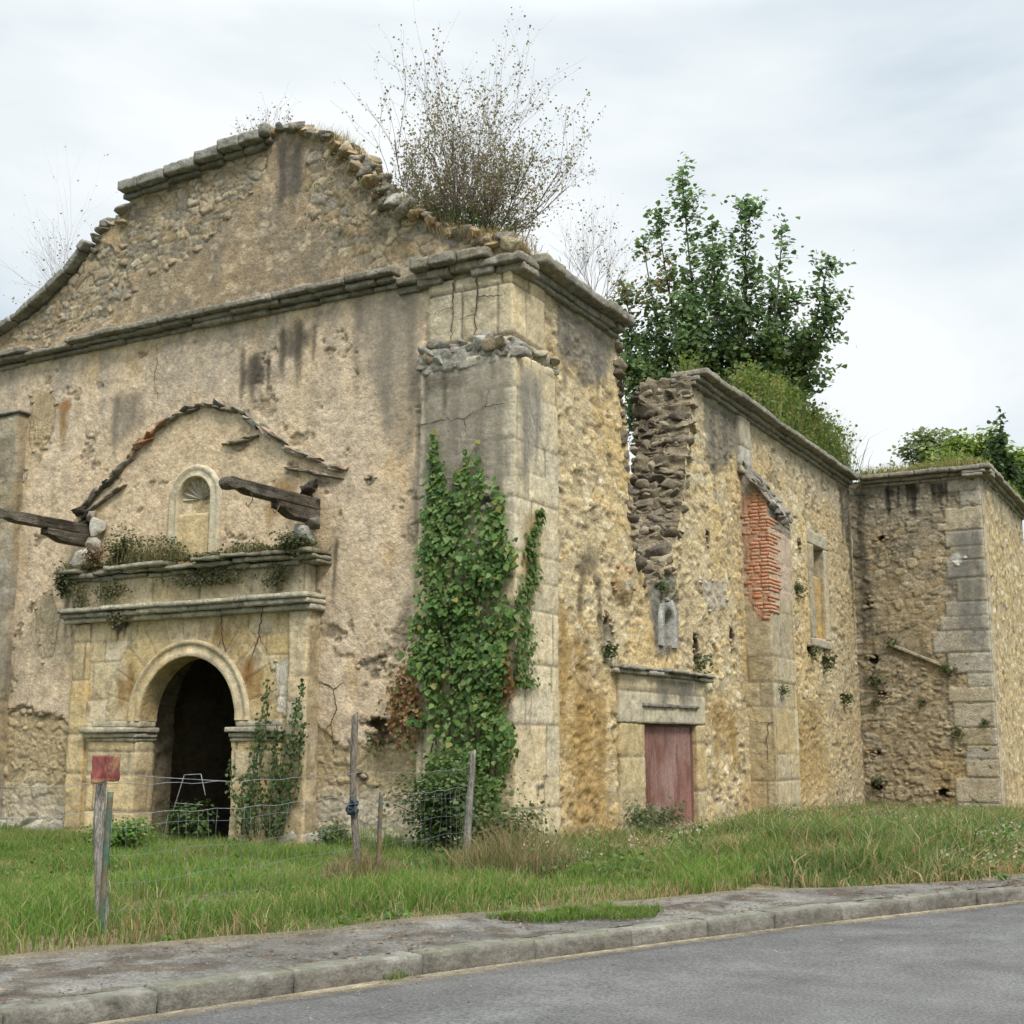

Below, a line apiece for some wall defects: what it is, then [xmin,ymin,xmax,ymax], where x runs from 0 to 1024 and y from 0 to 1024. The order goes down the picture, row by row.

crack [434,278,503,339]
leakage [241,329,315,388]
crack [420,388,505,434]
flaking render [740,492,782,621]
crack [321,681,343,753]
flaking render [1,705,69,825]